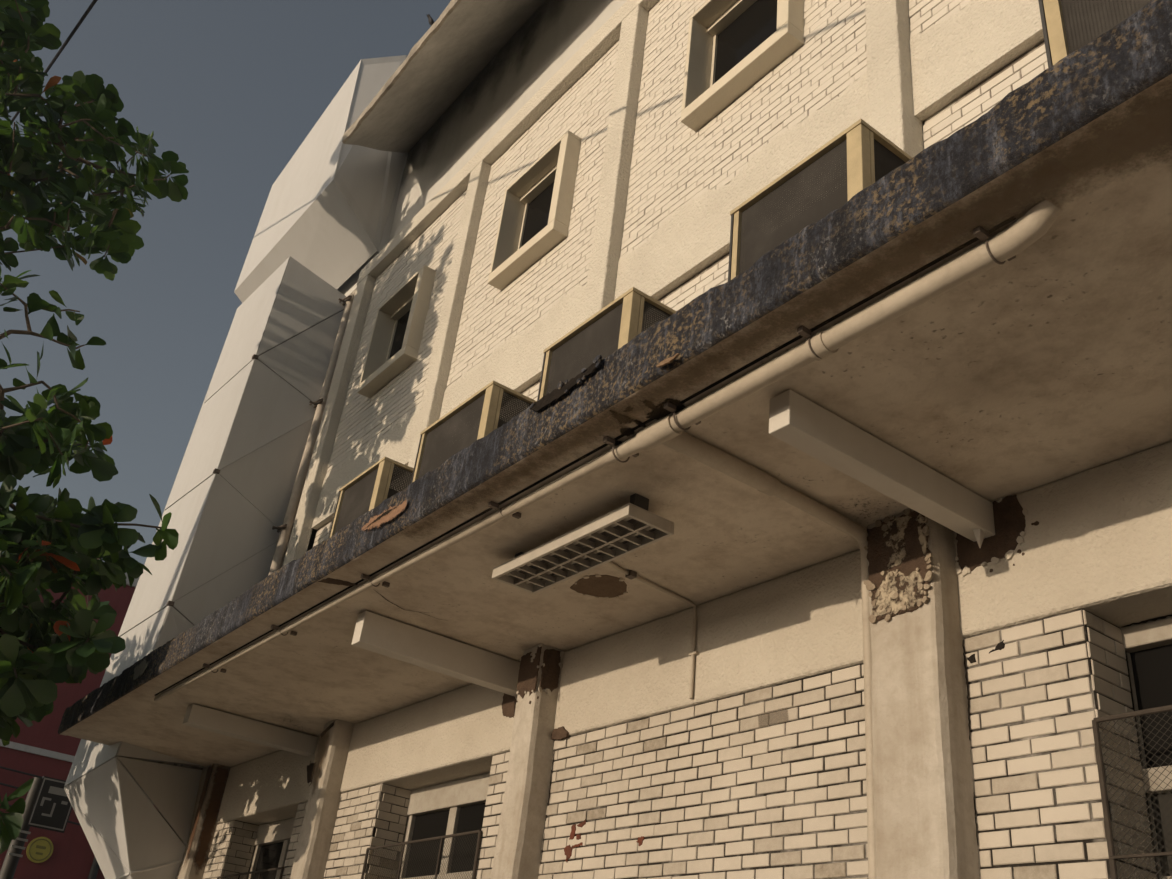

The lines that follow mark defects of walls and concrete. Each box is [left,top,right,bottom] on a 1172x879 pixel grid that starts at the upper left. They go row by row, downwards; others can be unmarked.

damp [406,0,549,166]
damp [405,84,1172,536]
spalling [570,574,628,599]
flaking render [864,508,933,624]
spalling [954,495,1039,577]
spalling [502,643,564,718]
spalling [551,726,569,741]
peeling [564,819,586,862]